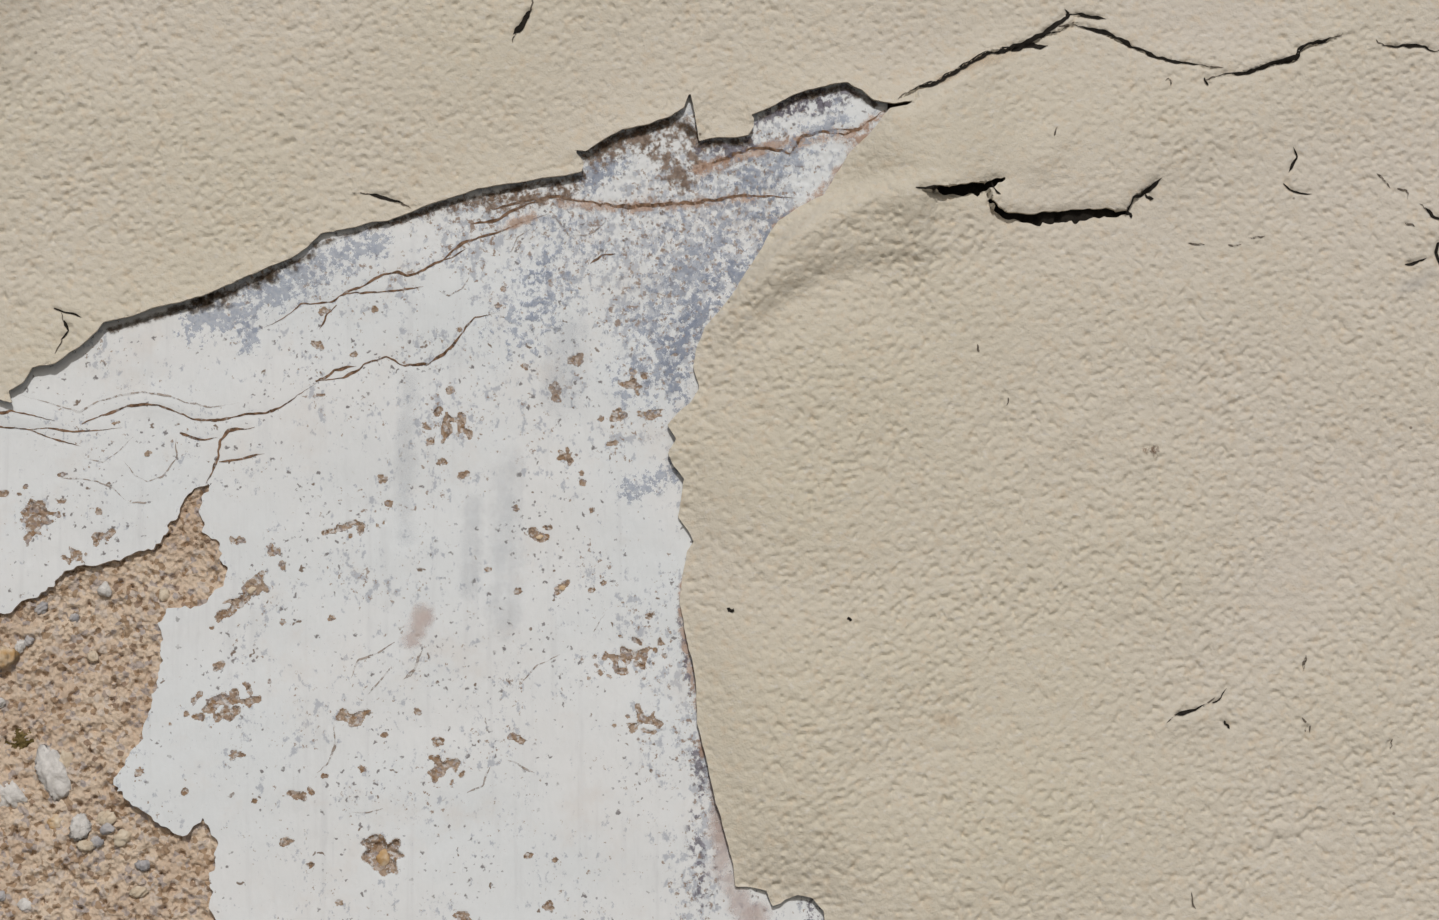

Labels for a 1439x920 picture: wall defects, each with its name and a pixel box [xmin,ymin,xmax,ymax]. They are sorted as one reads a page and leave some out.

crack [512,0,534,42]
crack [1376,40,1439,52]
crack [0,9,1342,504]
crack [1377,174,1439,266]
peeling [0,83,888,920]